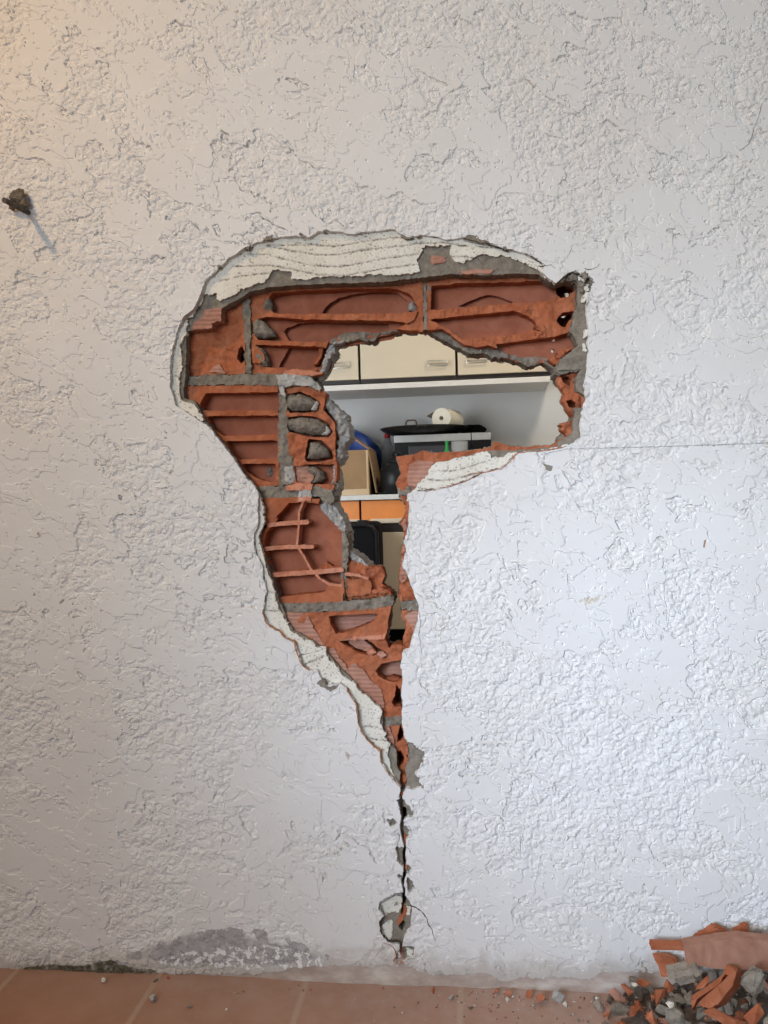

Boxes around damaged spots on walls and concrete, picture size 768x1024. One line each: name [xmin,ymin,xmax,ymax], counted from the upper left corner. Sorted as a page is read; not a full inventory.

spalling [171,229,595,958]